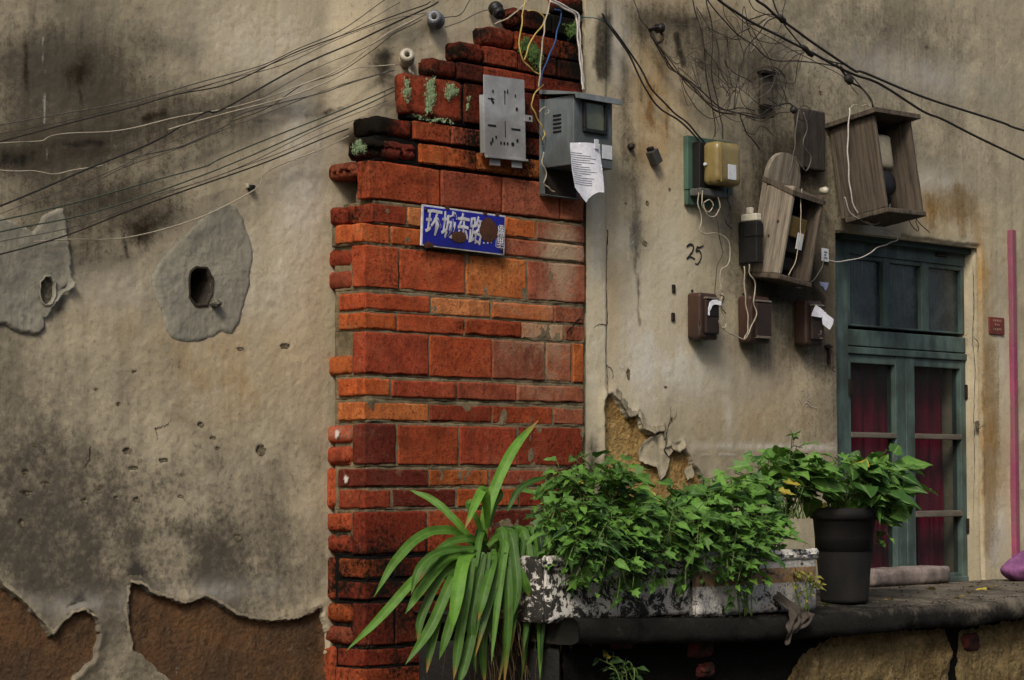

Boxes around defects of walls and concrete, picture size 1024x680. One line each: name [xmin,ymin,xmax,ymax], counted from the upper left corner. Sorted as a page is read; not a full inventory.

damp [123,219,165,249]
peeling [604,388,701,502]
damp [129,562,143,576]
peeling [0,575,98,680]
peeling [123,579,326,680]